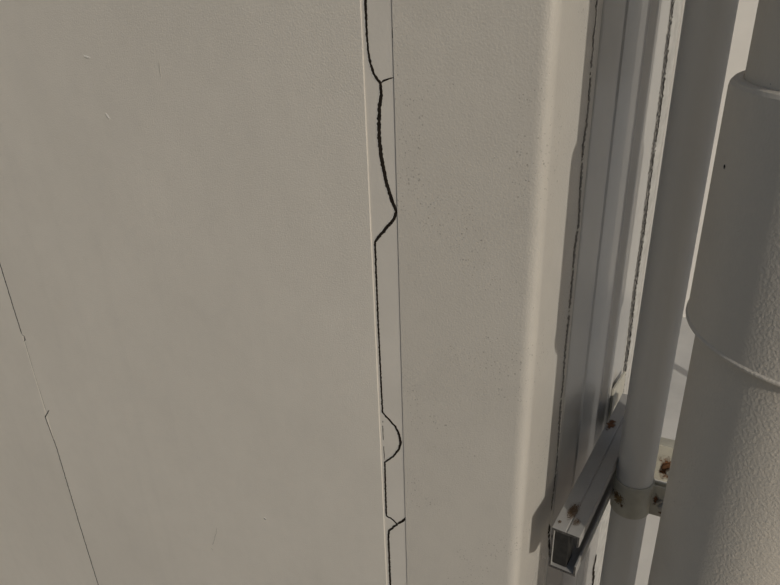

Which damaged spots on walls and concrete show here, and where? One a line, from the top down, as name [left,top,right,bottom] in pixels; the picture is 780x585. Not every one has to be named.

crack [0,264,98,583]
crack [363,0,406,585]
corrosion [558,502,581,526]